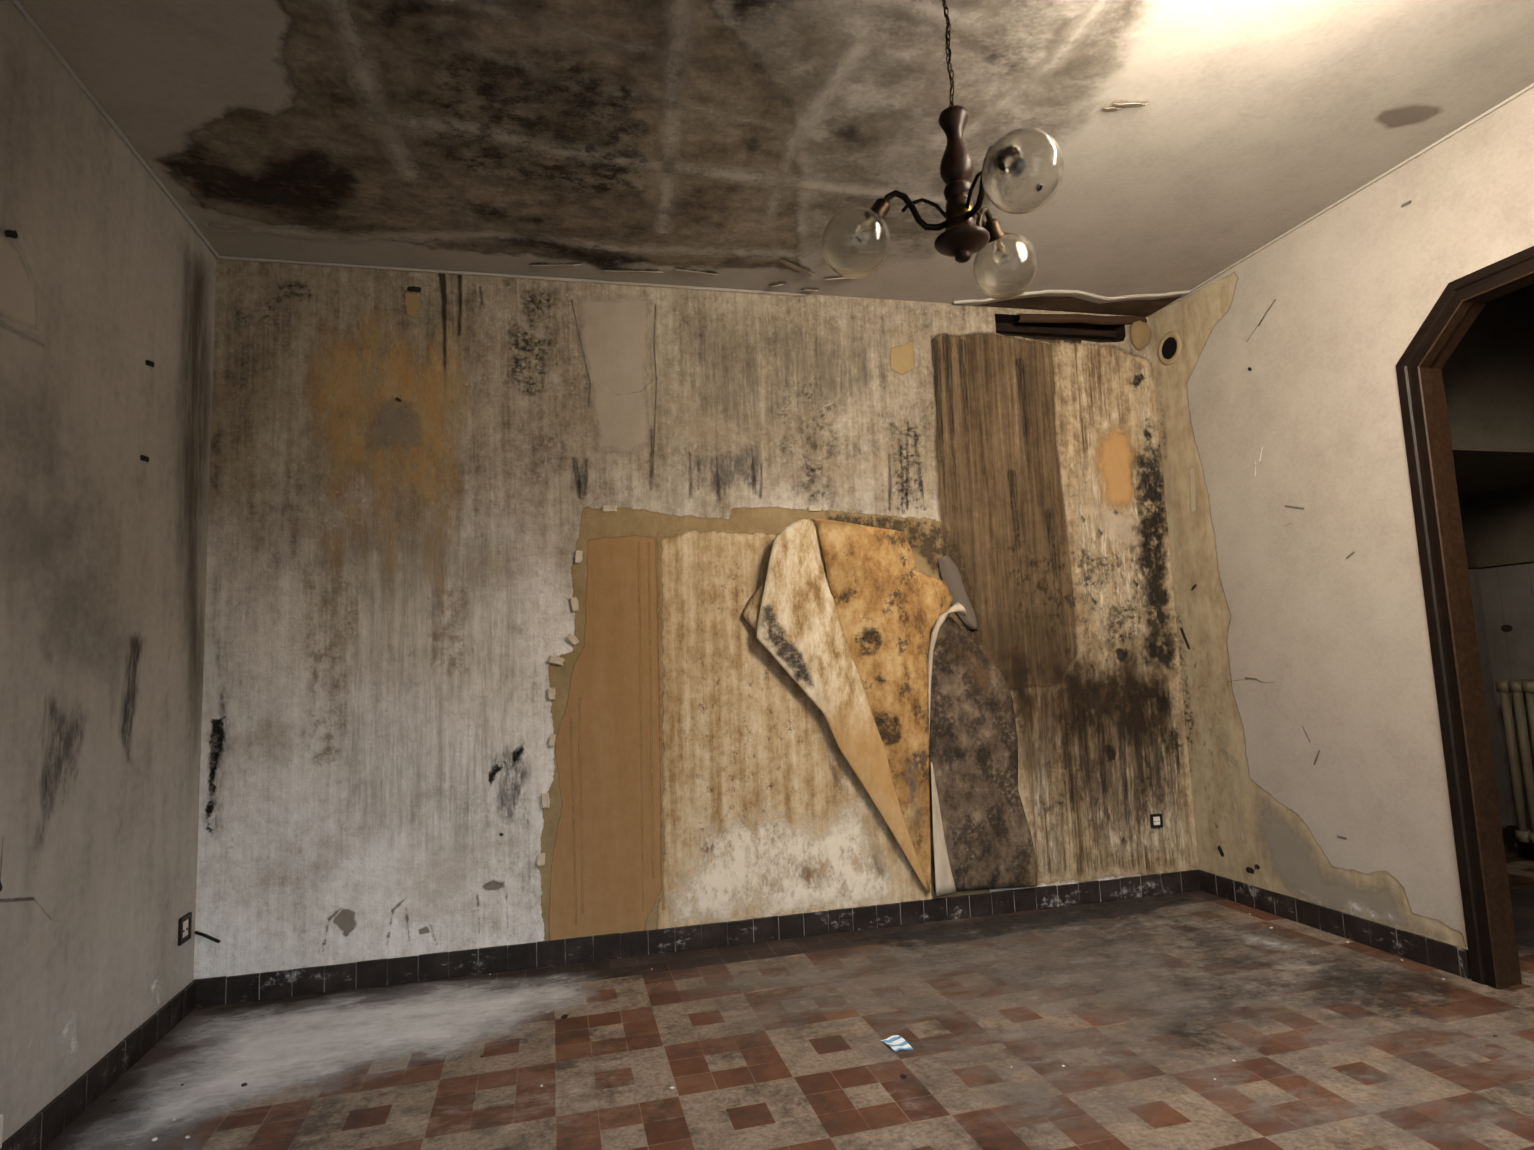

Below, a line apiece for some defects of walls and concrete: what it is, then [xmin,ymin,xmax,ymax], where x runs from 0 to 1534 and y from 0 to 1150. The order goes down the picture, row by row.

damp [158,0,1136,271]
damp [306,318,463,631]
mould [764,606,812,685]
mould [861,627,882,655]
damp [889,332,1199,885]
peeling [952,272,1466,949]
damp [205,696,225,832]
damp [489,747,527,836]
peeling [537,505,990,941]
mould [875,713,901,745]
damp [322,909,356,945]
damp [477,880,507,905]